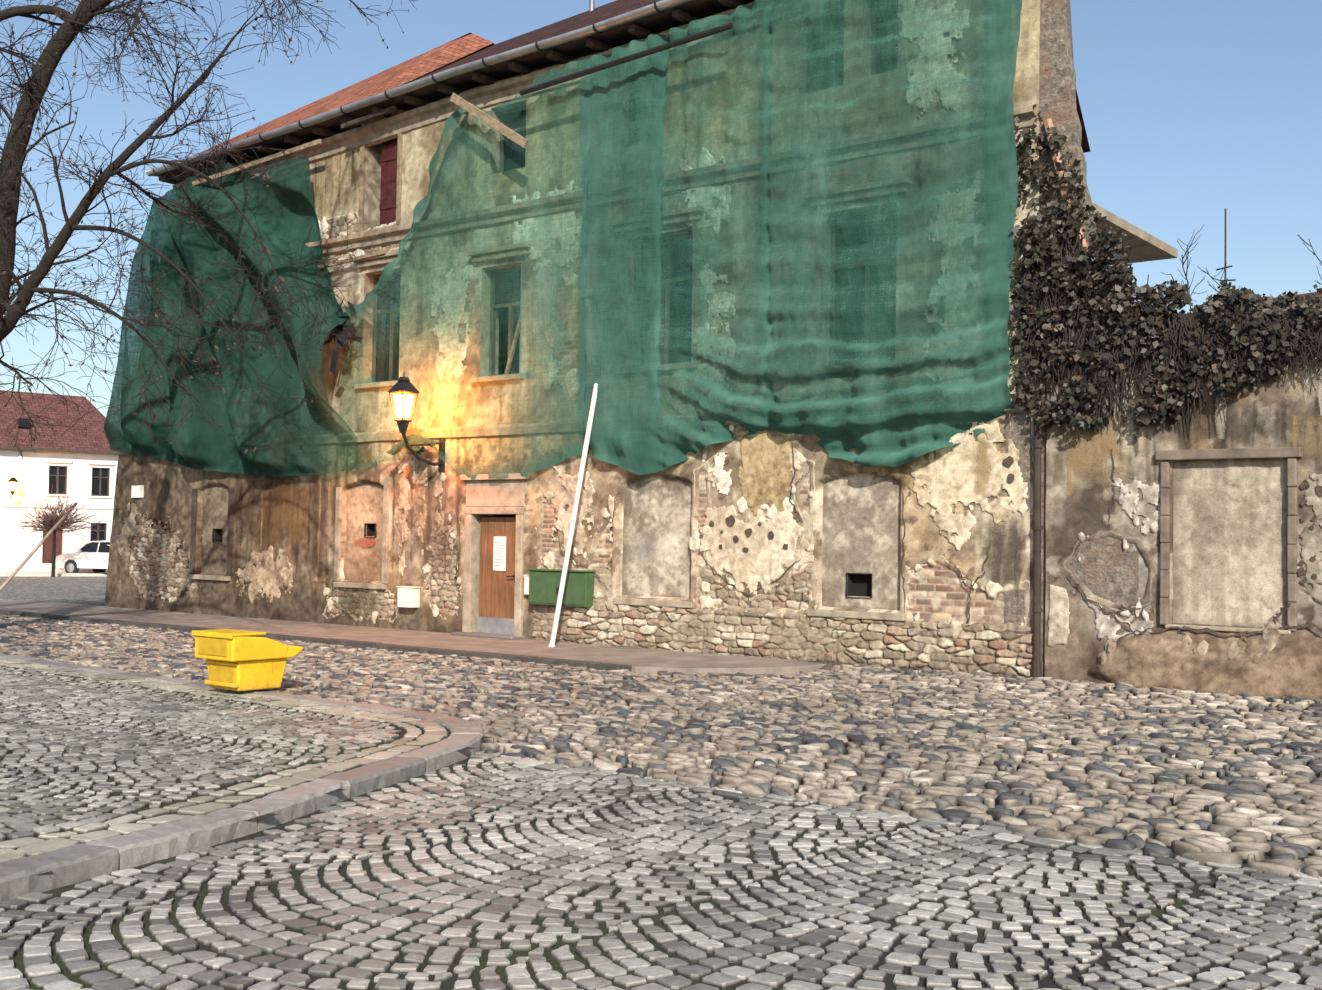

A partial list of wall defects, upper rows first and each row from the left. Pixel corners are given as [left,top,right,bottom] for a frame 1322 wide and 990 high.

peeling [693,273,735,360]
spalling [115,502,198,606]
peeling [235,545,293,604]
spalling [534,466,618,605]
peeling [689,425,817,615]
peeling [900,414,1033,638]
peeling [1047,476,1162,647]
peeling [1297,473,1322,588]